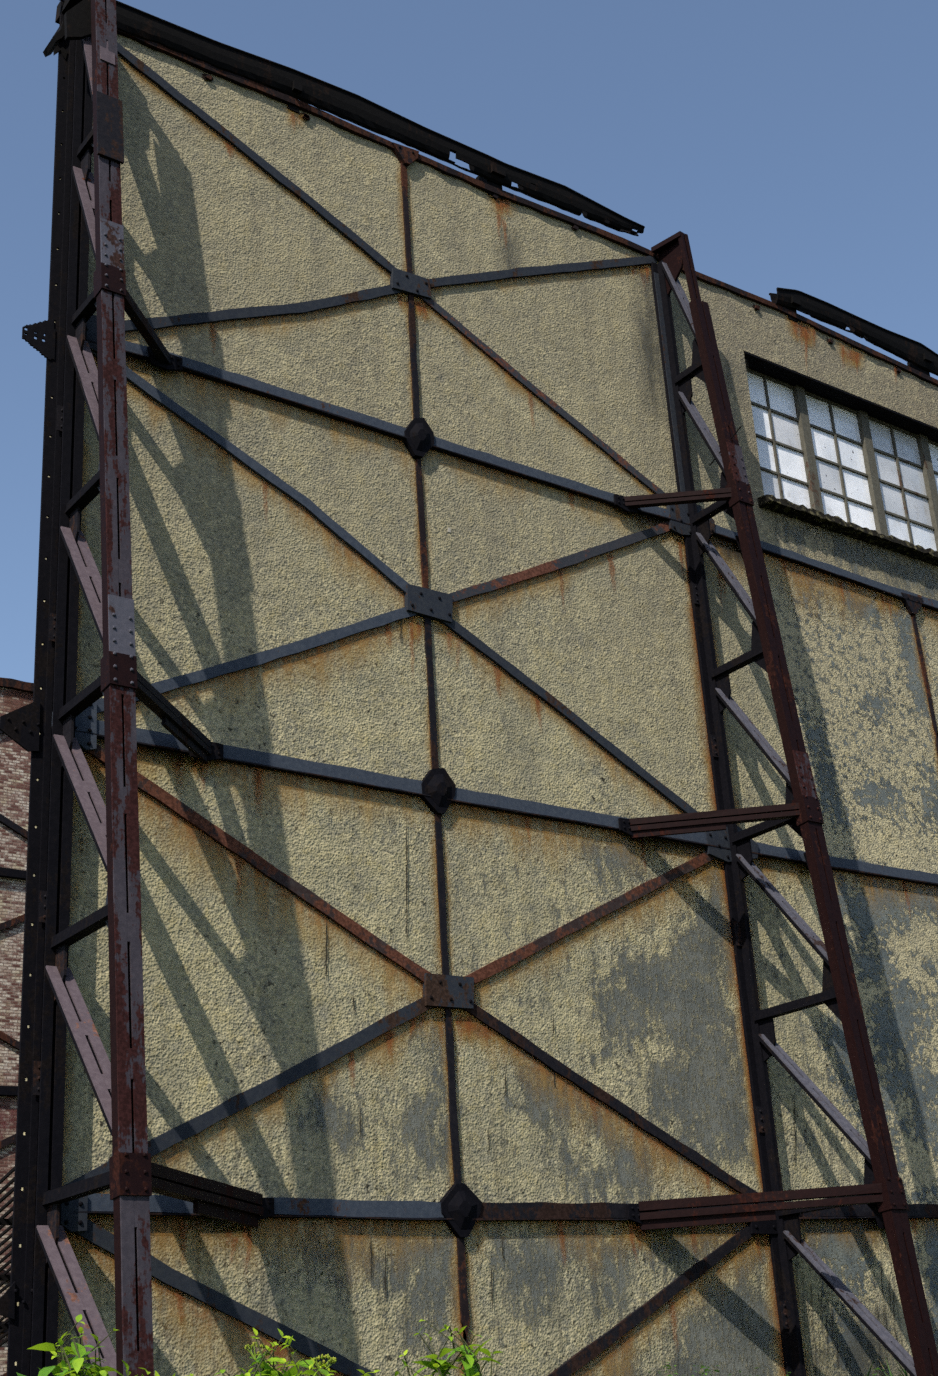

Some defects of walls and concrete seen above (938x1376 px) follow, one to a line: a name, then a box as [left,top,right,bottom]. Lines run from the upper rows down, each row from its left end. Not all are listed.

corrosion [127,356,404,597]
peeling [769,515,938,1350]
corrosion [731,950,763,1189]
peeling [796,1216,892,1376]